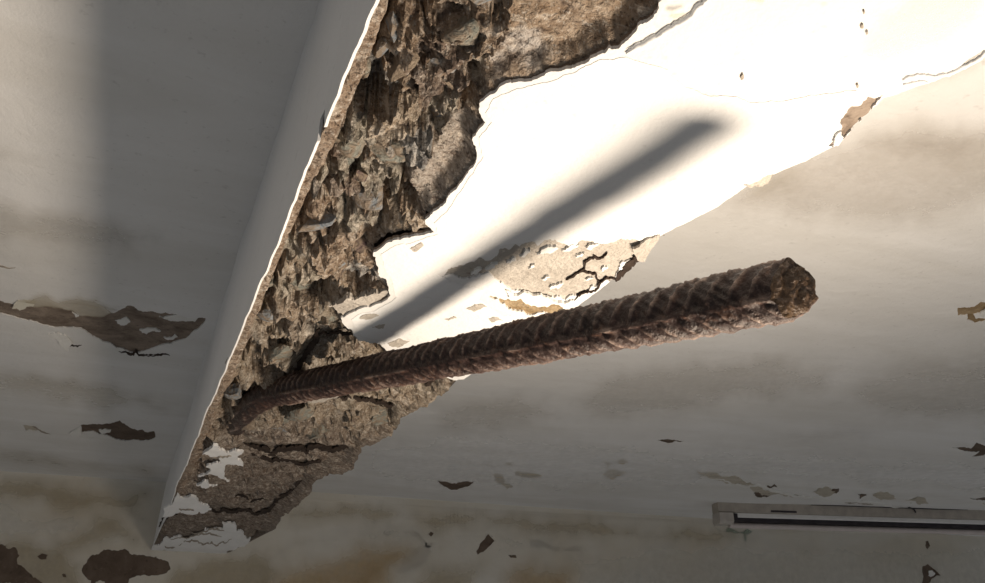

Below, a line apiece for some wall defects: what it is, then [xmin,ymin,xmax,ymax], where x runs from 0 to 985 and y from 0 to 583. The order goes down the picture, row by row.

peeling [902,50,985,86]
spalling [831,97,879,147]
spalling [82,0,819,583]
crack [566,252,639,301]
peeling [0,299,206,352]
peeling [957,302,985,322]
peeling [69,420,155,440]
peeling [953,443,985,457]
crack [212,442,349,516]
peeling [0,544,42,583]
leakage [6,543,75,583]
leakage [586,552,985,583]